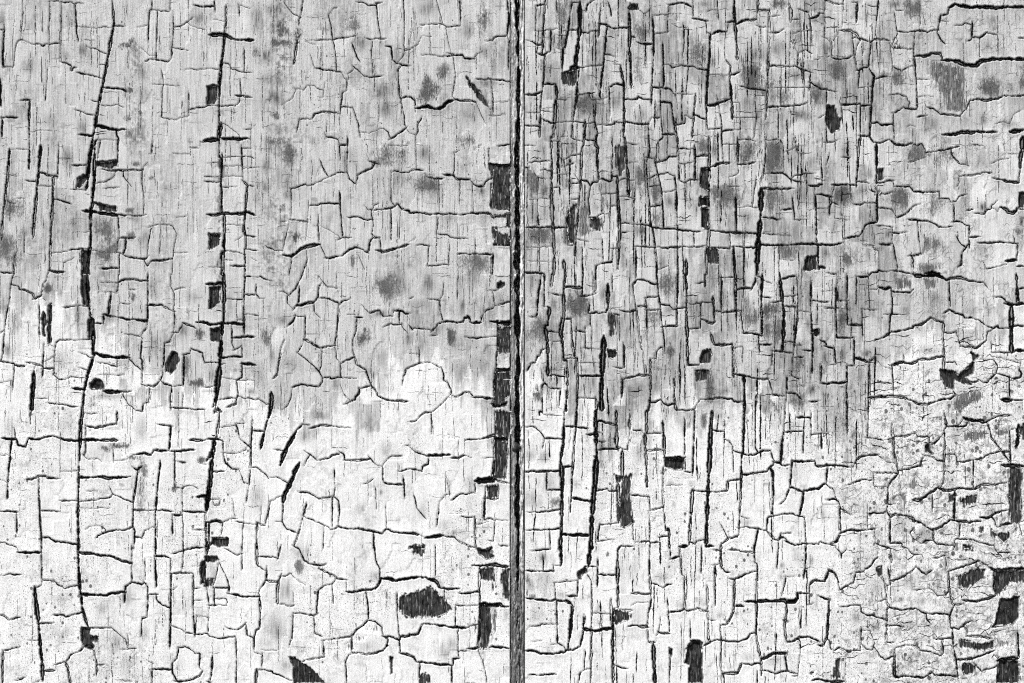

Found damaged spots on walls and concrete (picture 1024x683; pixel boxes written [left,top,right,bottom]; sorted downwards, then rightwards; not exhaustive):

peeling [825,106,840,133]
peeling [489,146,511,288]
crack [0,0,512,683]
peeling [477,321,513,499]
crack [524,0,1024,683]
peeling [940,352,983,412]
peeling [616,474,632,528]
peeling [386,586,452,618]
peeling [478,547,510,650]
peeling [958,567,1024,651]
peeling [291,657,324,683]
peeling [669,642,703,683]